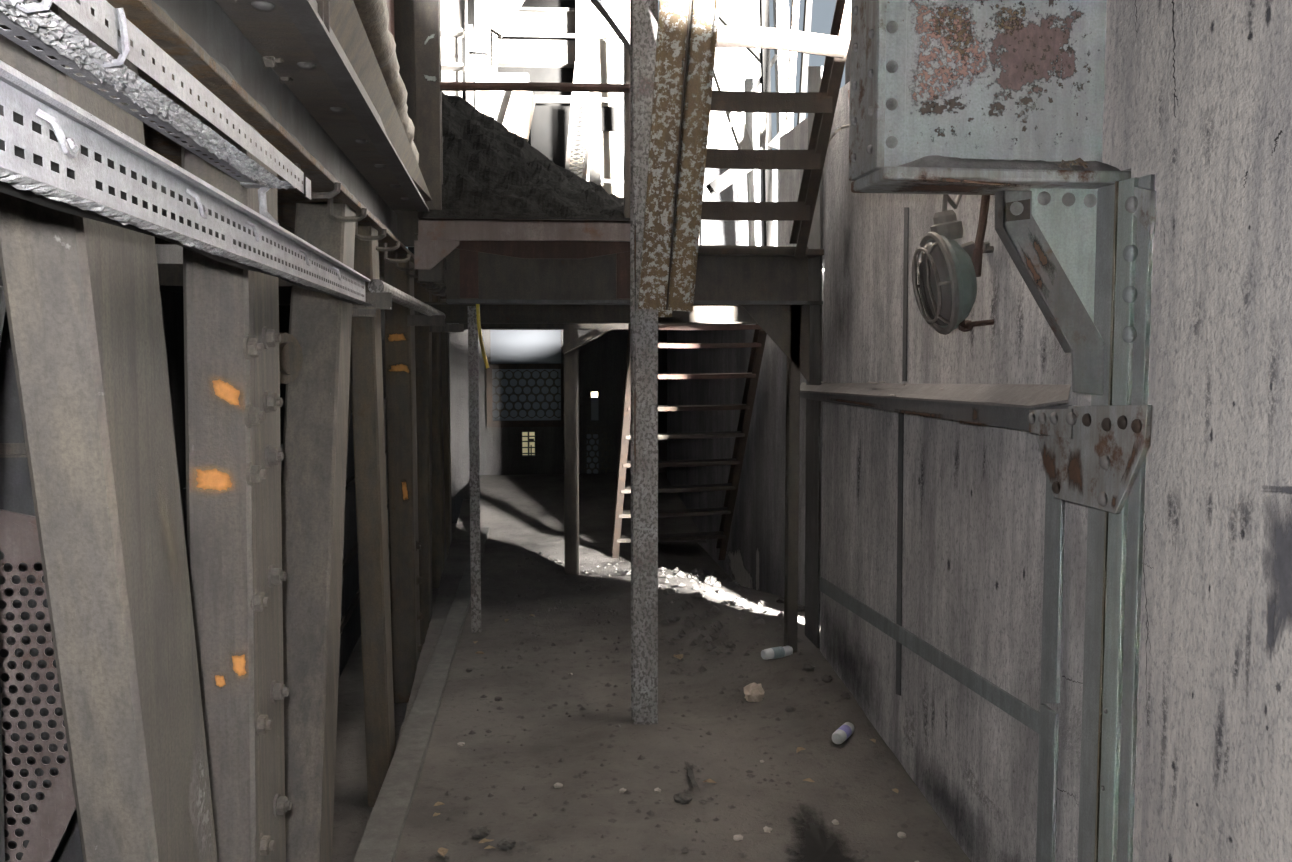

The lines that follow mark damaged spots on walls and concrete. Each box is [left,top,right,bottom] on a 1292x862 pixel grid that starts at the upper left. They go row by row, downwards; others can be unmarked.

rust [919,95,964,137]
rust [988,97,1053,121]
rust [1042,444,1083,493]
rust [1122,445,1138,478]